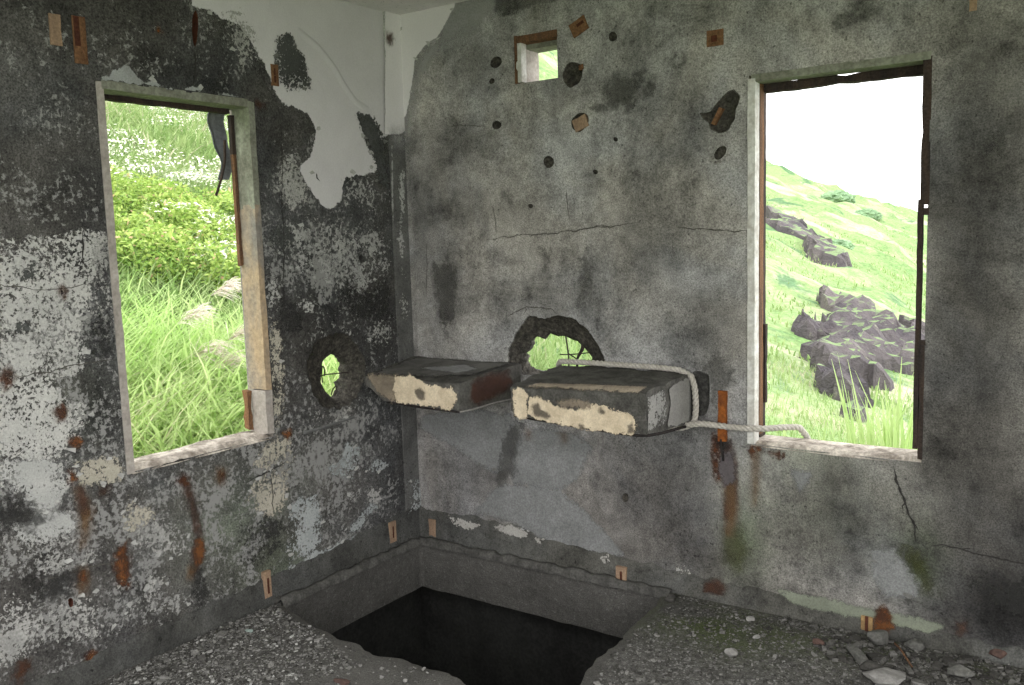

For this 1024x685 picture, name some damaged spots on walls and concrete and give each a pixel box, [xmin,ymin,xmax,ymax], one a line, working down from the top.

peeling [192,0,455,295]
spalling [700,89,740,133]
crack [486,190,631,240]
crack [675,226,747,234]
rust [0,369,13,393]
peeling [0,227,125,575]
rust [178,475,206,573]
peeling [248,275,392,570]
flaking render [392,315,667,556]
rust [710,433,739,525]
crack [893,466,1024,564]
rust [873,607,895,631]